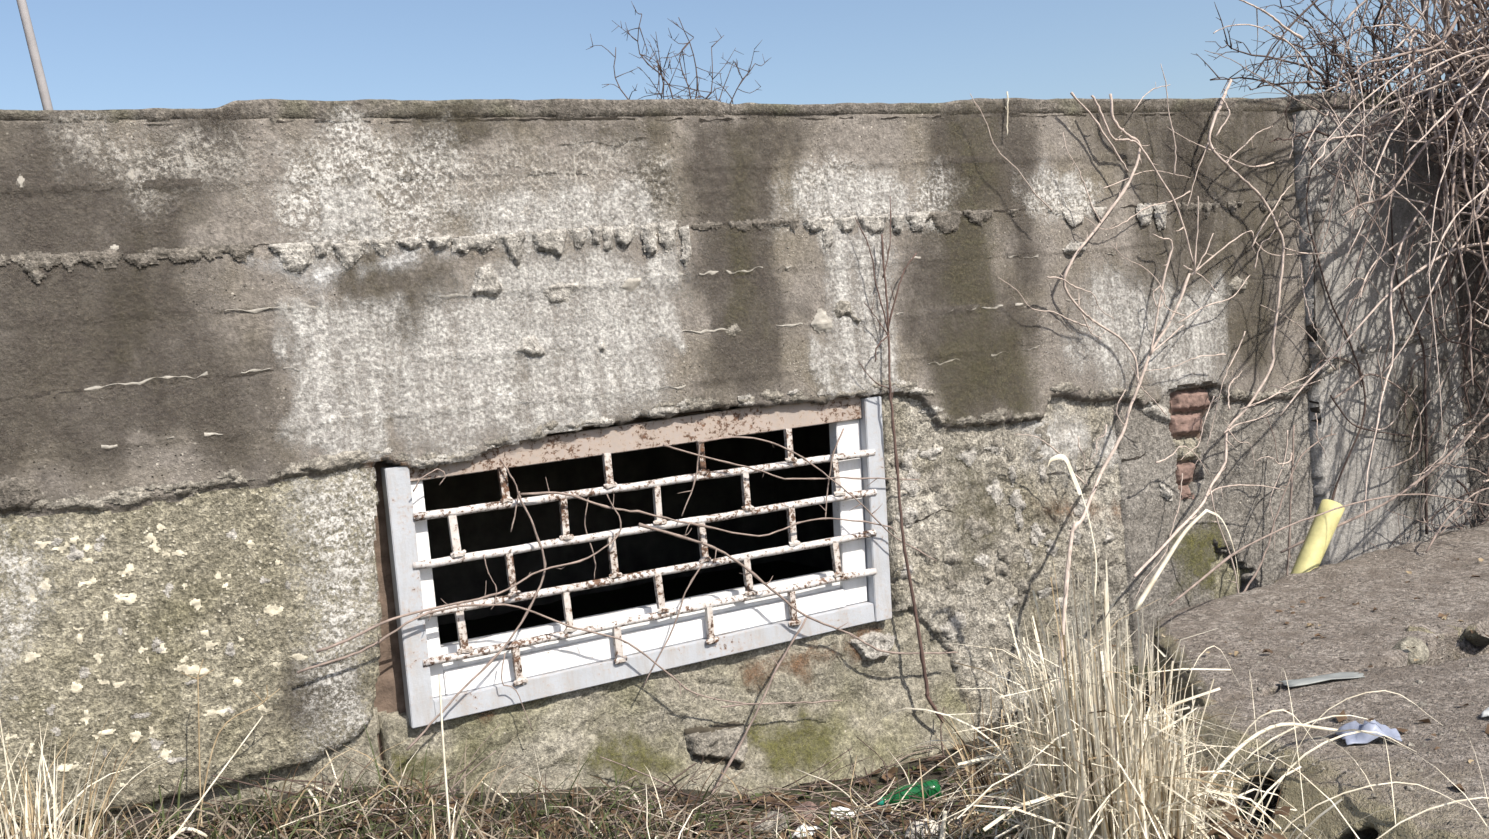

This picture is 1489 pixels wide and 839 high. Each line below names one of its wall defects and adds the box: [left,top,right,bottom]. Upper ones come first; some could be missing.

leakage [0,107,267,477]
spalling [361,435,510,469]
spalling [0,208,1019,299]
leakage [275,104,797,737]
leakage [794,104,1118,463]
spalling [528,328,1455,731]